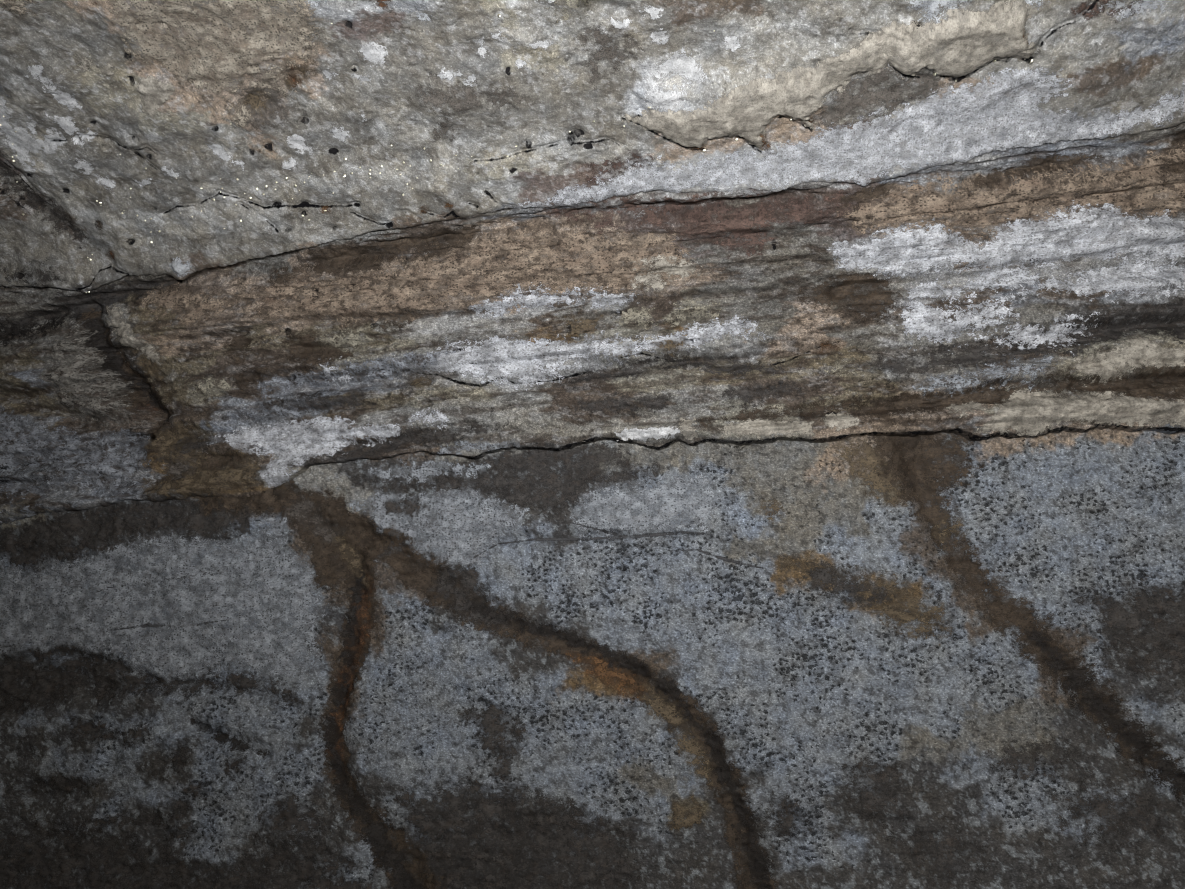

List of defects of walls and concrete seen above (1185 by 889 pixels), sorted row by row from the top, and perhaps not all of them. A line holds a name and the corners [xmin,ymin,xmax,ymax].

crack [890,0,1099,82]
crack [76,266,129,291]
crack [431,422,1185,458]
damp [0,200,1185,889]